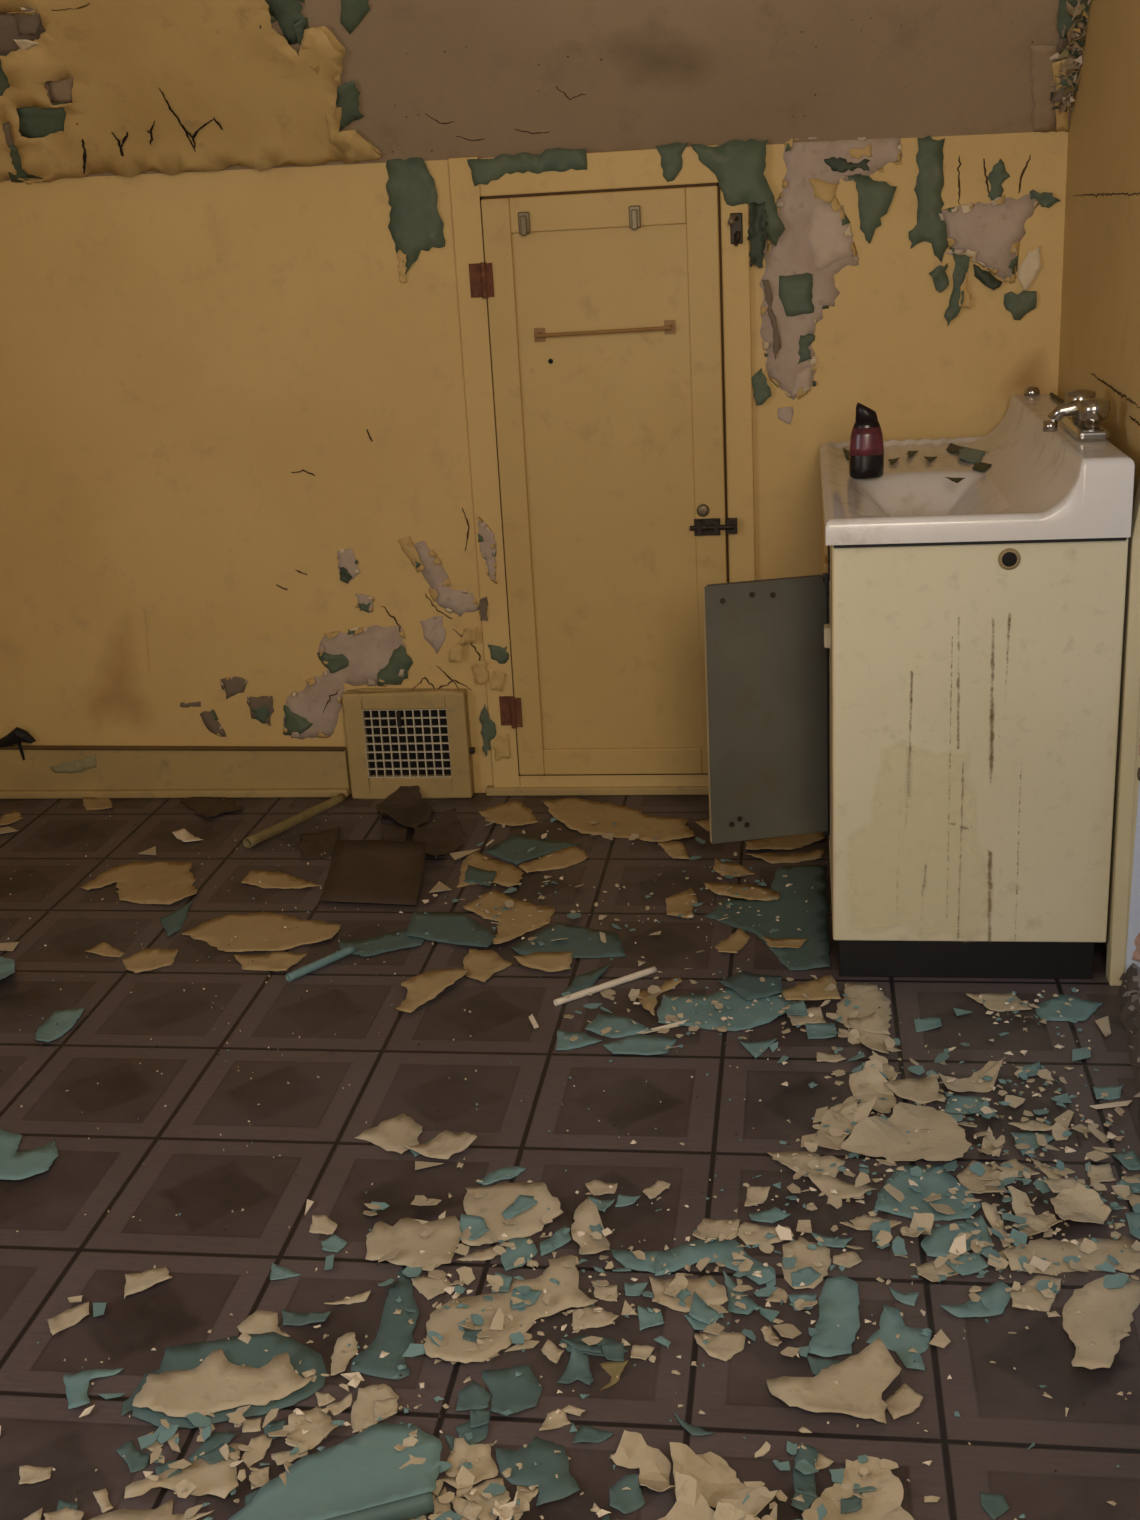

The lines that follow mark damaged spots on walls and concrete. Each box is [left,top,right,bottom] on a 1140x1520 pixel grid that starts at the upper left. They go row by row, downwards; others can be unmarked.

peeling [0,0,445,283]
flaking render [656,136,1060,425]
peeling [1030,0,1091,132]
flaking render [180,516,510,761]